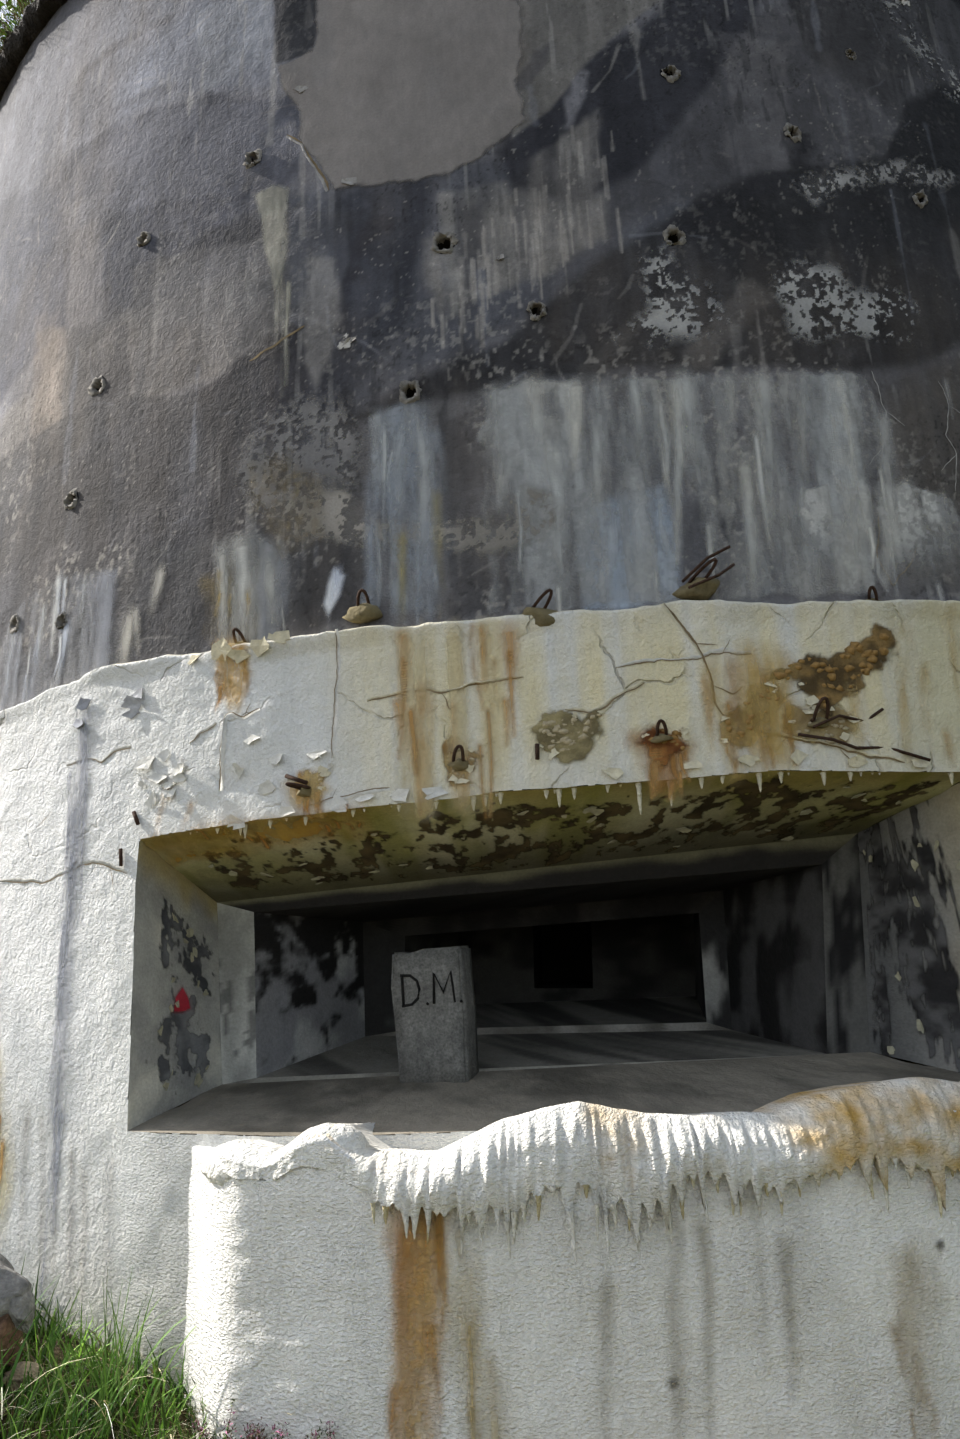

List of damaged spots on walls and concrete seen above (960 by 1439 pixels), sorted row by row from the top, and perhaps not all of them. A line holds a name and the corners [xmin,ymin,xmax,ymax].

peeling [278,0,525,189]
water stain [239,376,712,613]
water stain [742,372,955,596]
water stain [59,728,87,995]
flaking render [134,749,188,808]
corrosion [216,581,250,704]
water stain [219,538,286,643]
corrosion [396,643,433,805]
corrosion [448,631,514,796]
peeling [187,623,960,1073]
water stain [206,1077,960,1268]
corrosion [402,1212,461,1390]